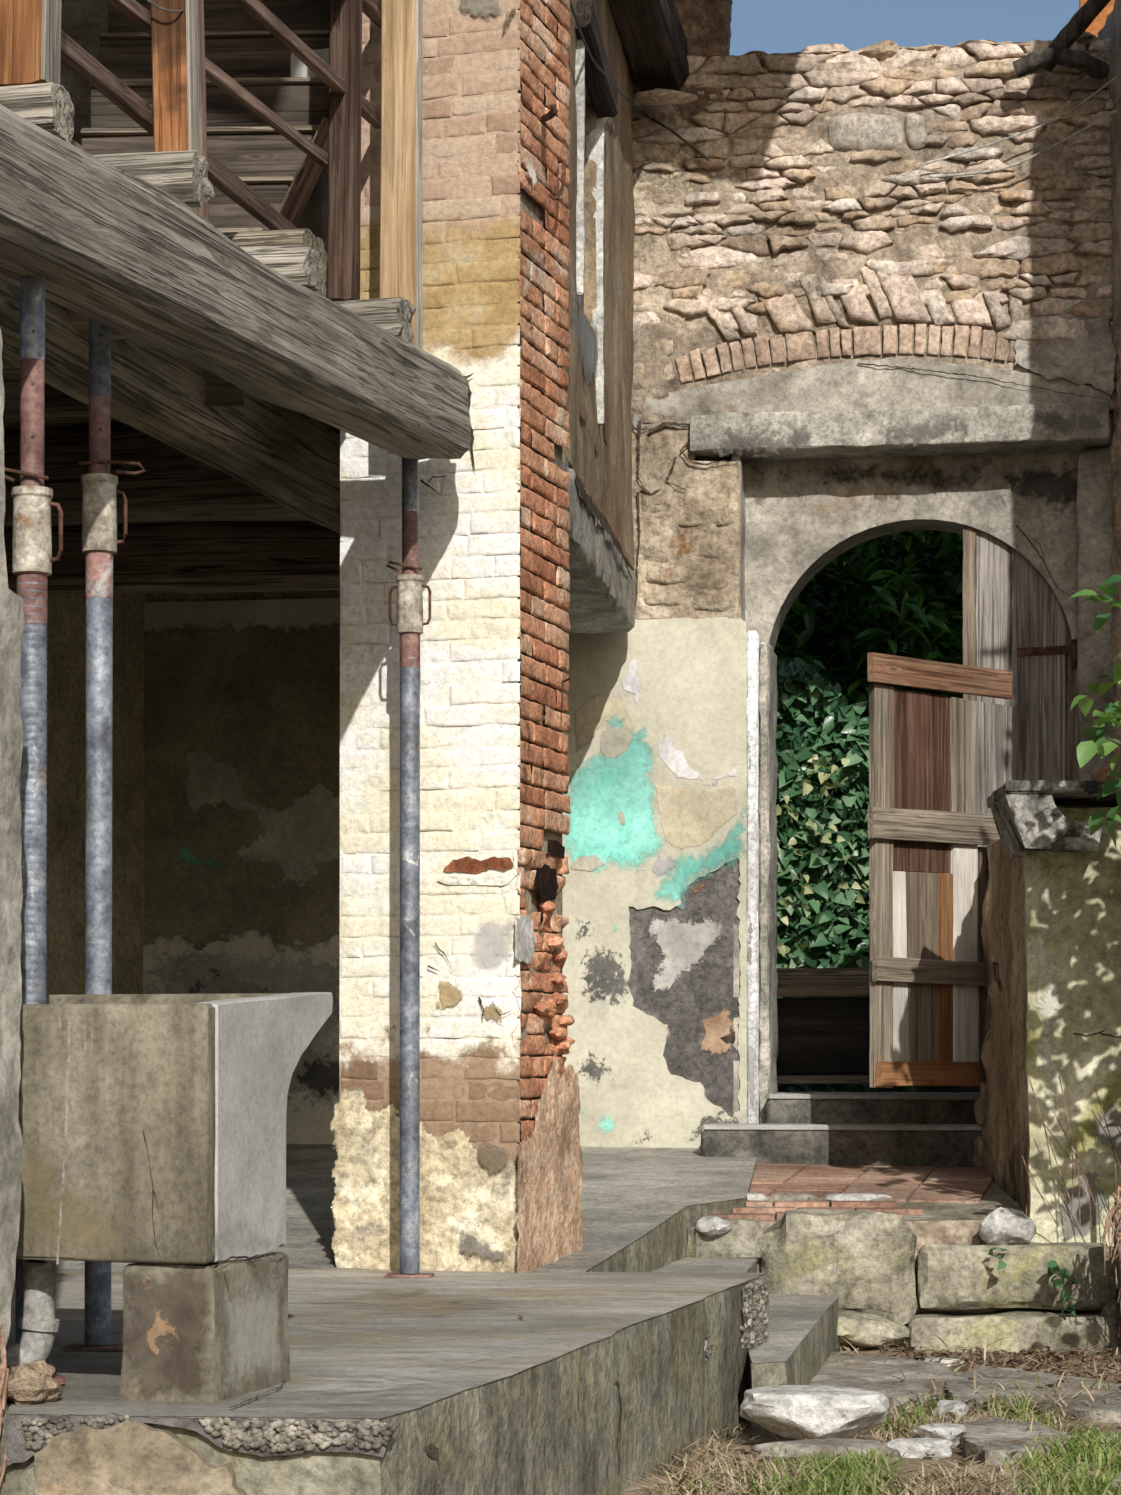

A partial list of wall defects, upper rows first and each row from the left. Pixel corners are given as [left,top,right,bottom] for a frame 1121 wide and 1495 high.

spalling [437,659,756,1115]
leakage [145,943,340,1112]
spalling [475,1142,509,1175]
spalling [460,1234,508,1262]